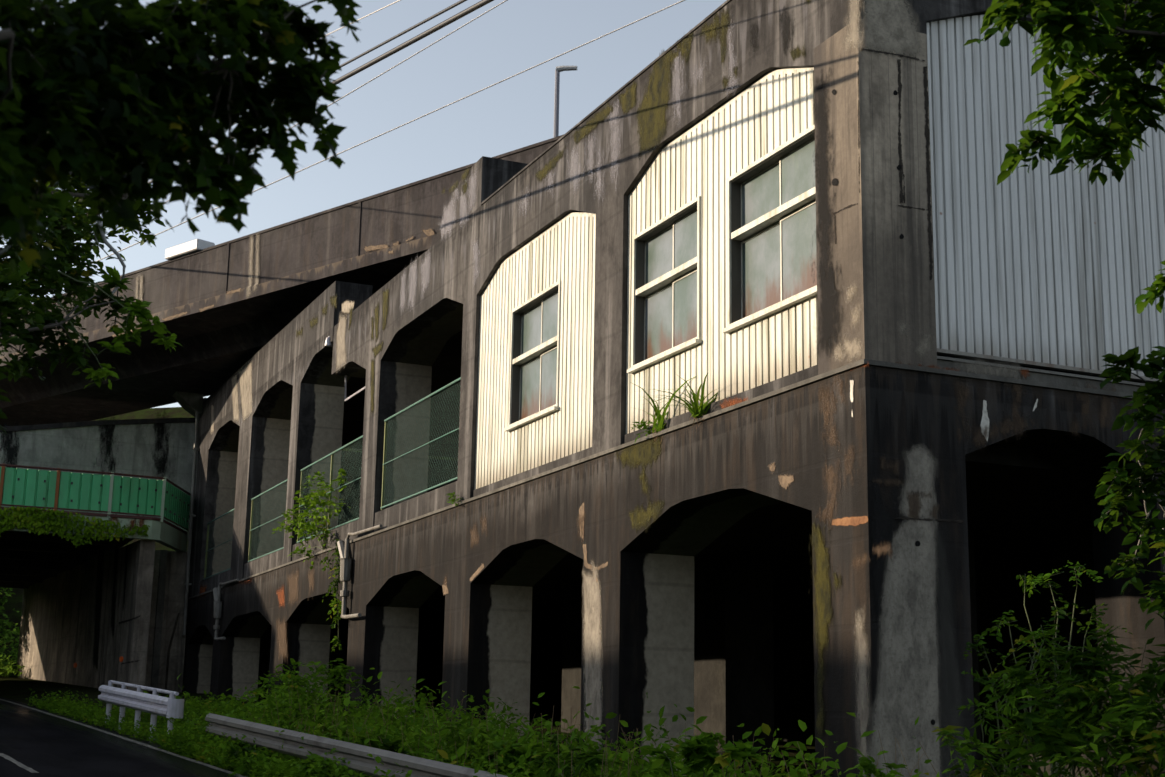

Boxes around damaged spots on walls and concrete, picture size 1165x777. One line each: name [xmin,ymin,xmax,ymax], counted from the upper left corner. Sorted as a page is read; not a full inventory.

water stain [810,76,841,354]
crack [833,47,933,280]
water stain [96,417,116,475]
water stain [153,412,170,477]
spalling [832,516,868,526]
water stain [853,492,893,615]
water stain [907,492,939,520]
water stain [582,562,603,751]